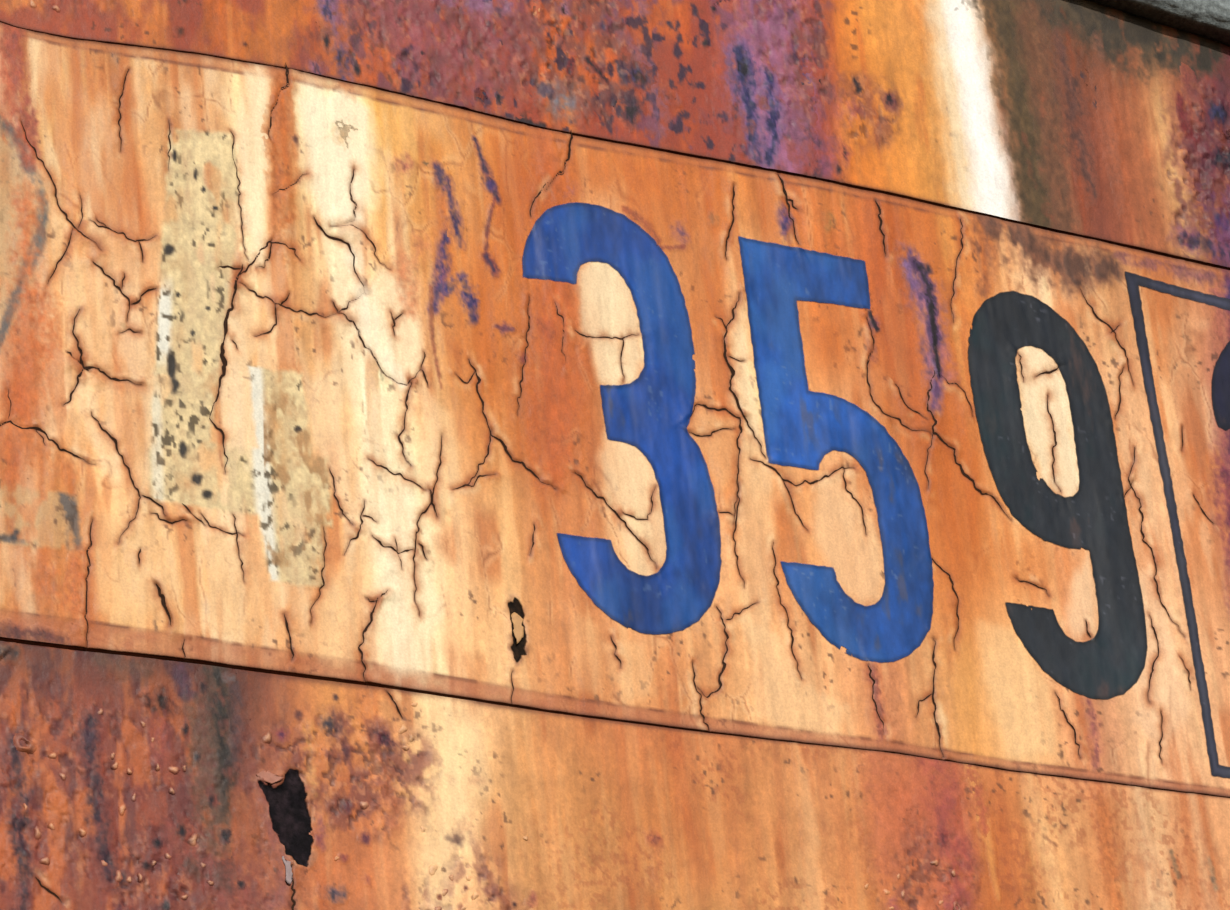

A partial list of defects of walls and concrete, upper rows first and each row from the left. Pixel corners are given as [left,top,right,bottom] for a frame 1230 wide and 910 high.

crack [21,122,156,333]
crack [0,309,244,657]
crack [209,132,656,718]
rust [379,132,598,497]
peeling [508,597,527,662]
rust [260,0,906,269]
crack [690,300,867,728]
crack [1124,450,1191,760]
rust [70,680,299,910]
peeling [256,768,314,884]
rust [268,692,410,910]
rust [844,660,995,910]